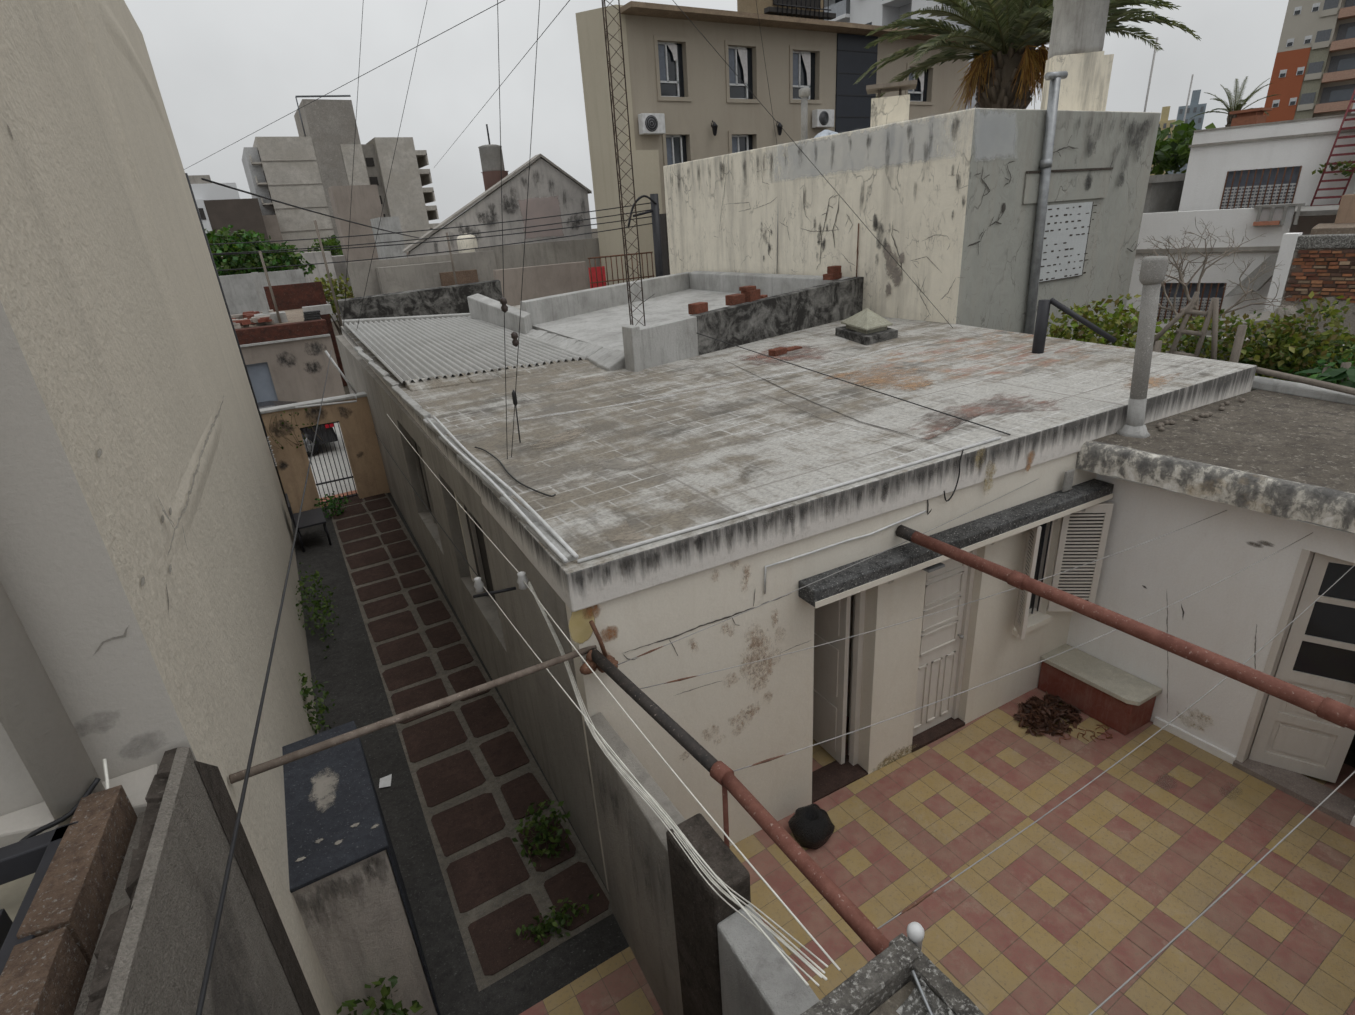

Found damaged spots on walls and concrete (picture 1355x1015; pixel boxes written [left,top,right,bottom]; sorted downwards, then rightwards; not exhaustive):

crack [159,396,224,553]
crack [96,628,128,652]